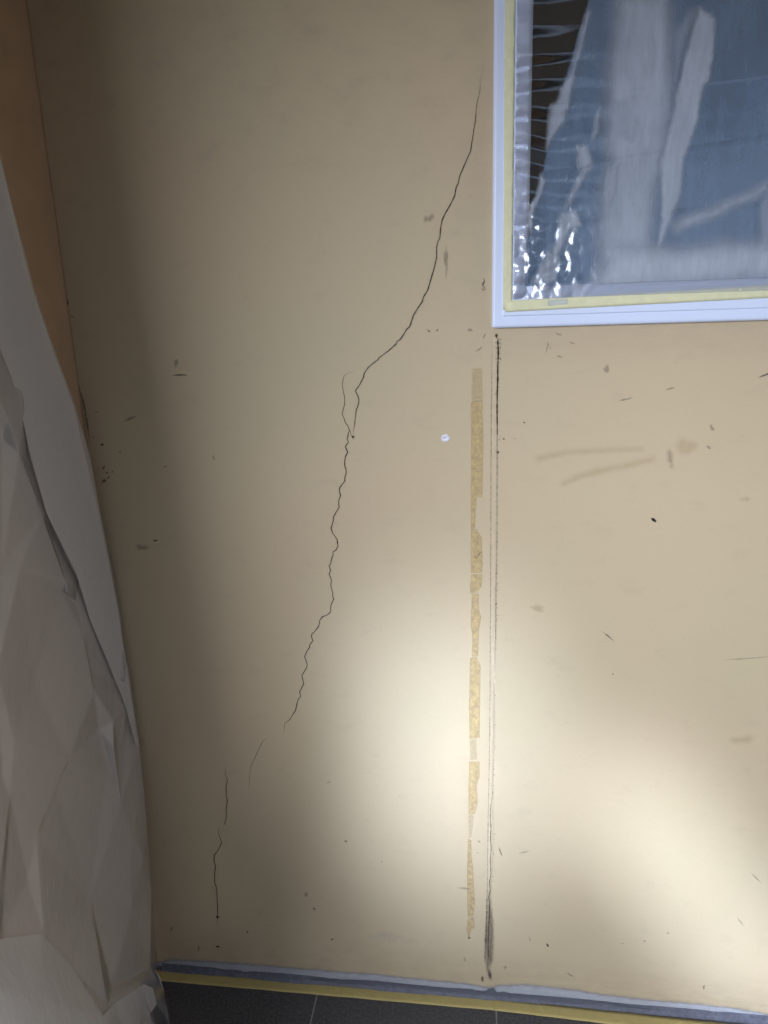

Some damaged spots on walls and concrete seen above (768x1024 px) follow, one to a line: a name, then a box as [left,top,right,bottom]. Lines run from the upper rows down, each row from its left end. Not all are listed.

crack [284,91,480,730]
crack [493,339,501,453]
crack [213,743,262,947]
crack [487,769,495,957]